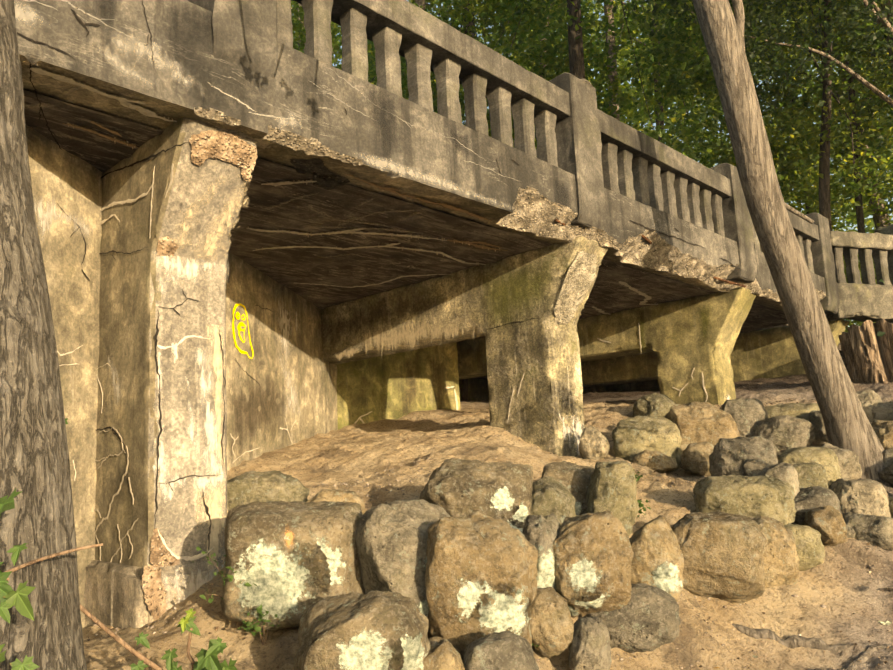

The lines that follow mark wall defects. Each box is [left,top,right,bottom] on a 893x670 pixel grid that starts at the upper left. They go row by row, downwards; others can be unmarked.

crack [24,0,155,70]
crack [17,32,76,149]
spalling [189,107,363,190]
spalling [156,236,179,258]
spalling [496,186,780,325]
crack [96,426,127,465]
crack [154,289,262,556]
damp [559,394,582,455]
spalling [142,528,181,621]